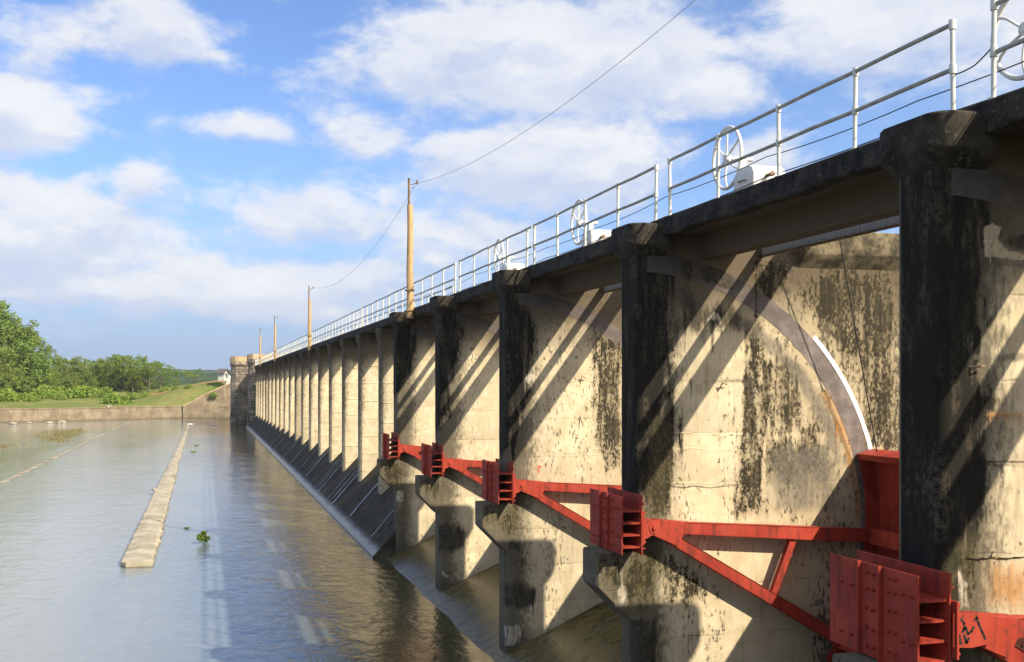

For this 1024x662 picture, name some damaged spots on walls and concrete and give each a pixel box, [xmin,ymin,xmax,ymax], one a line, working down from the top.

peeling [983,223,1024,264]
leakage [590,333,622,473]
leakage [670,260,899,520]